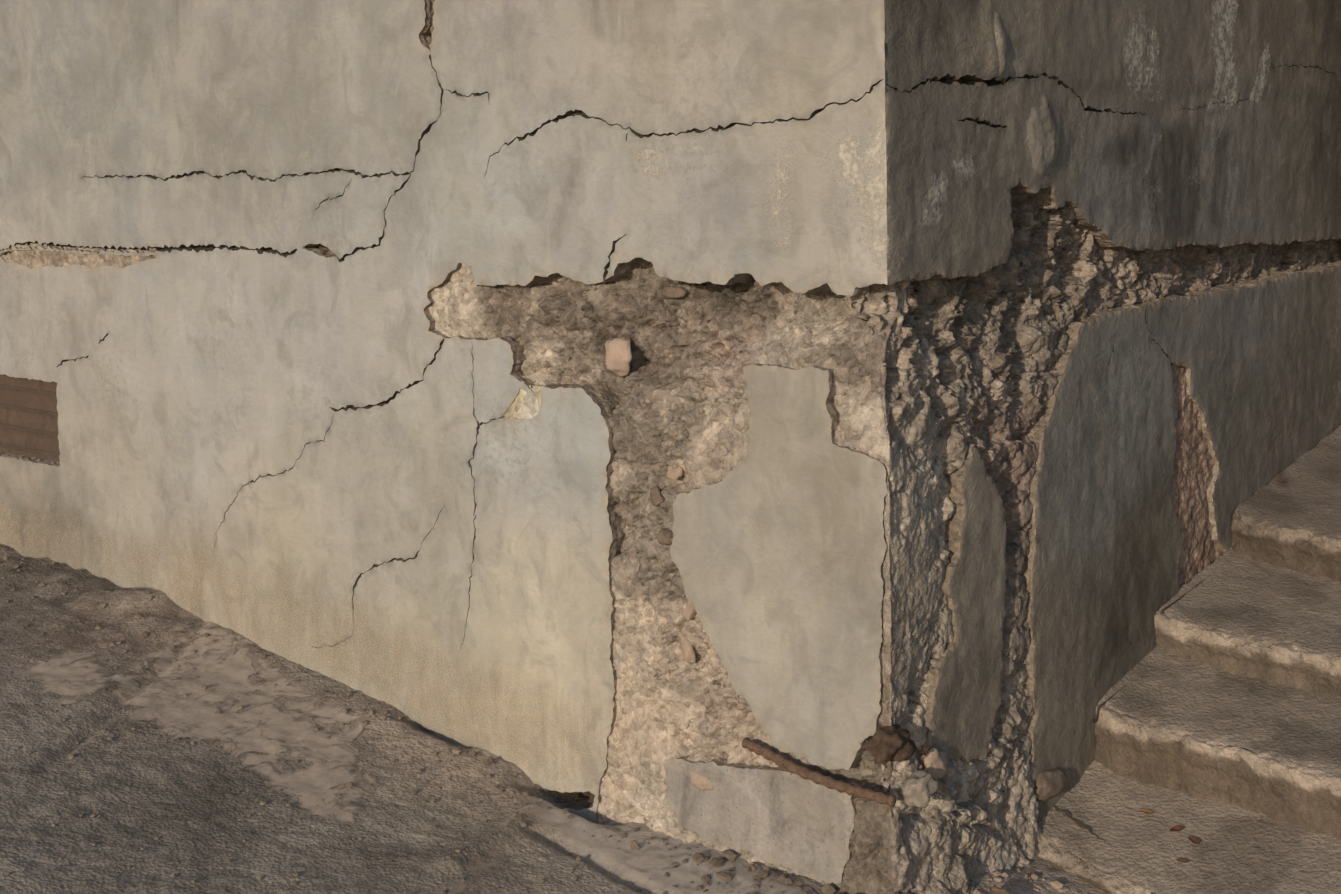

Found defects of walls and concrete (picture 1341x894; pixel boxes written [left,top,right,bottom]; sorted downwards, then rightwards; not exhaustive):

leakage [1206,0,1270,125]
crack [84,55,490,262]
crack [484,72,1144,176]
leakage [923,159,975,225]
crack [0,241,297,269]
crack [603,233,627,280]
crack [57,333,109,367]
crack [214,339,503,650]
flaking render [423,182,1341,894]